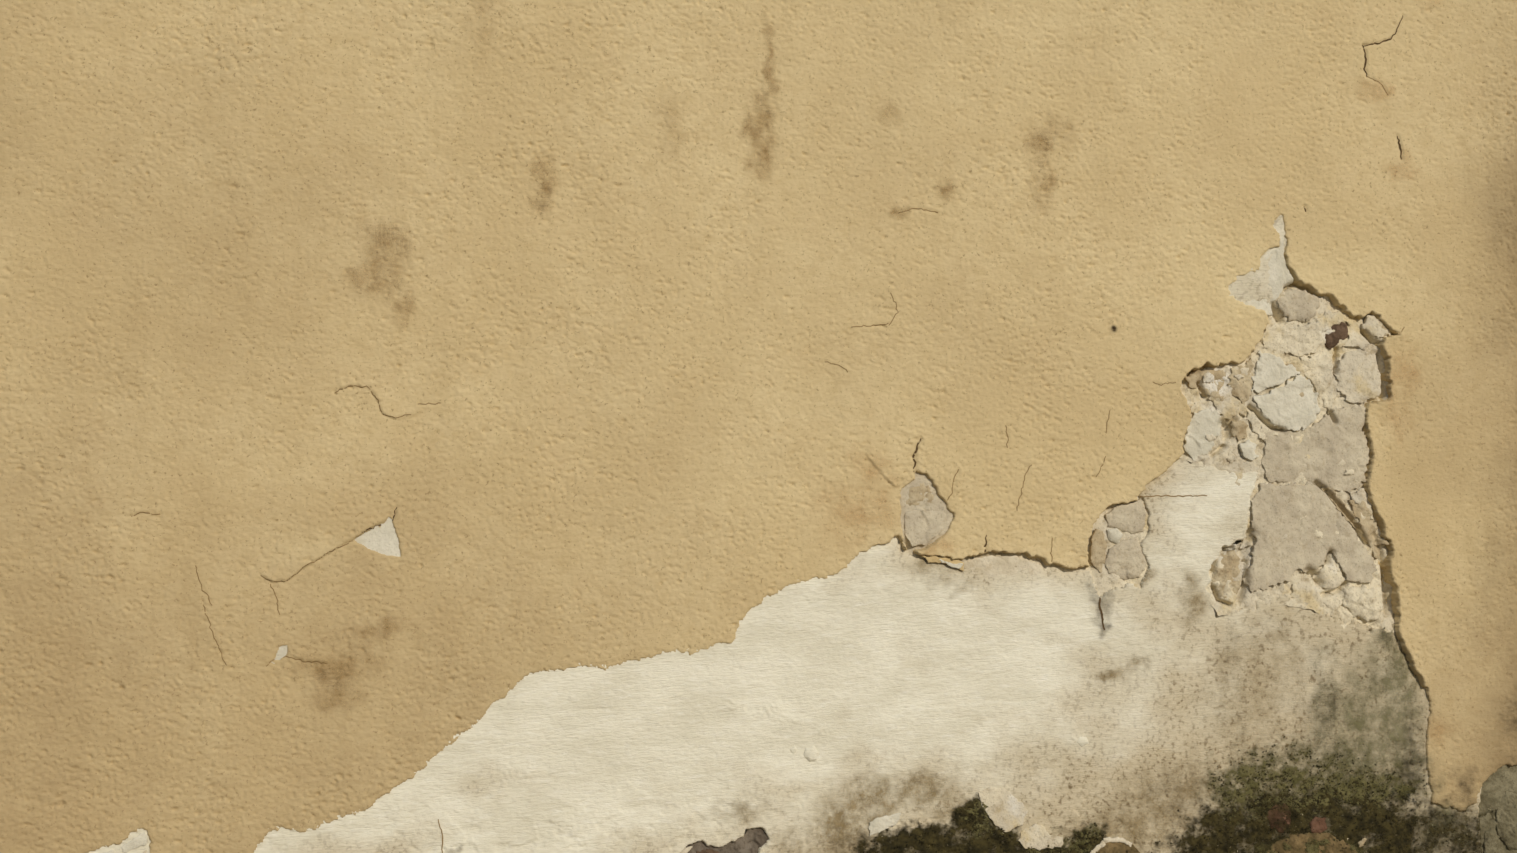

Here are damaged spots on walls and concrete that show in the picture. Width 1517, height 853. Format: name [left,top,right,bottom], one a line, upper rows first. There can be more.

peeling [254,215,1517,853]
peeling [89,828,151,853]
water stain [825,776,937,853]